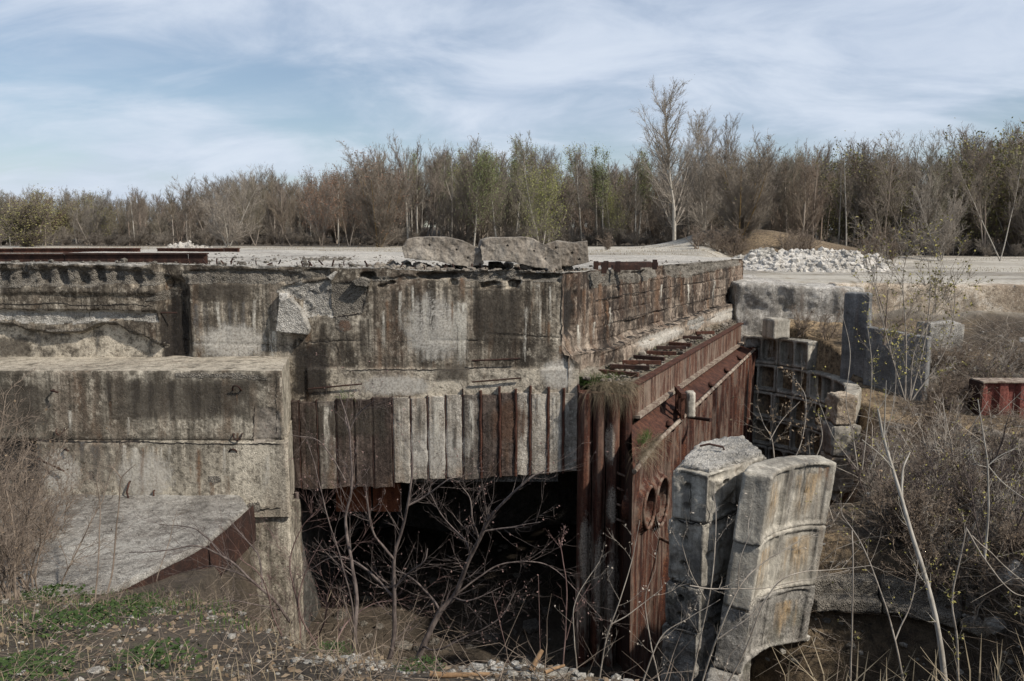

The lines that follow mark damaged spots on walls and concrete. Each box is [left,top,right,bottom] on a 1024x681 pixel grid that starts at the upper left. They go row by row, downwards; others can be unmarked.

crack [2,302,152,320]
spalling [0,258,560,348]
damp [294,284,541,453]
damp [0,384,48,429]
damp [107,379,258,421]
damp [44,442,100,495]
damp [118,445,171,495]
corrosion [122,505,256,591]